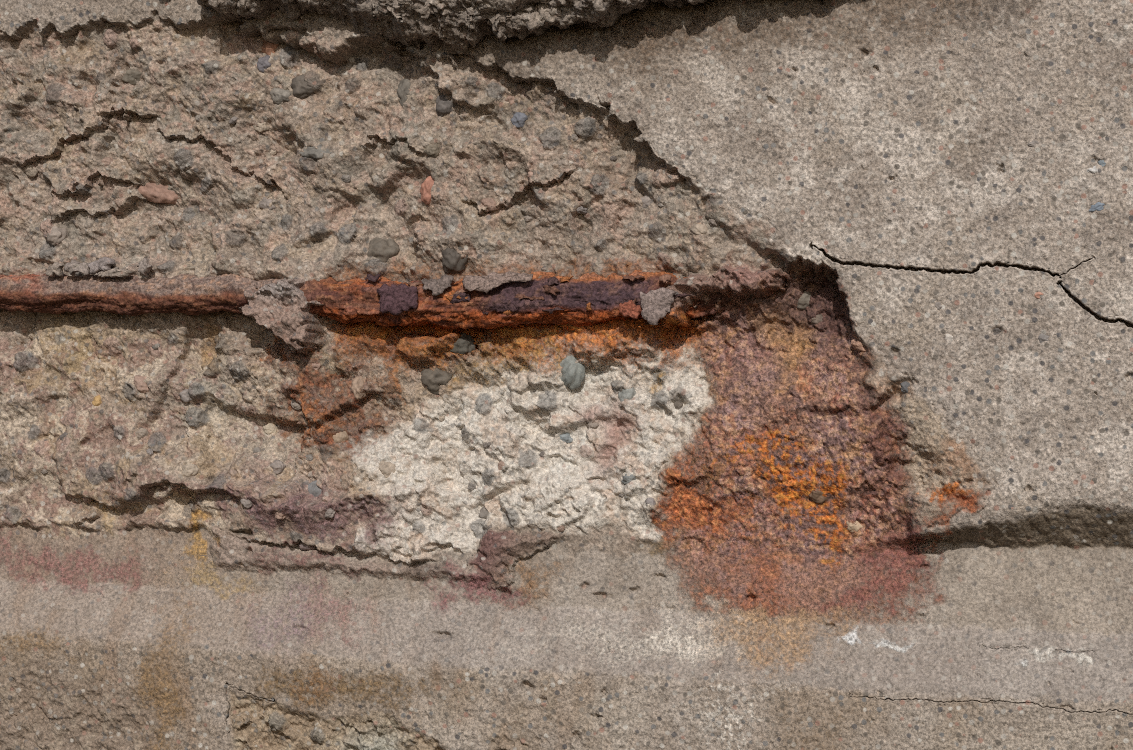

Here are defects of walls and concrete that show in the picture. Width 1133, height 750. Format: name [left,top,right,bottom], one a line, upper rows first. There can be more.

spalling [0,10,996,590]
corrosion [337,260,979,664]
crack [812,242,1133,331]